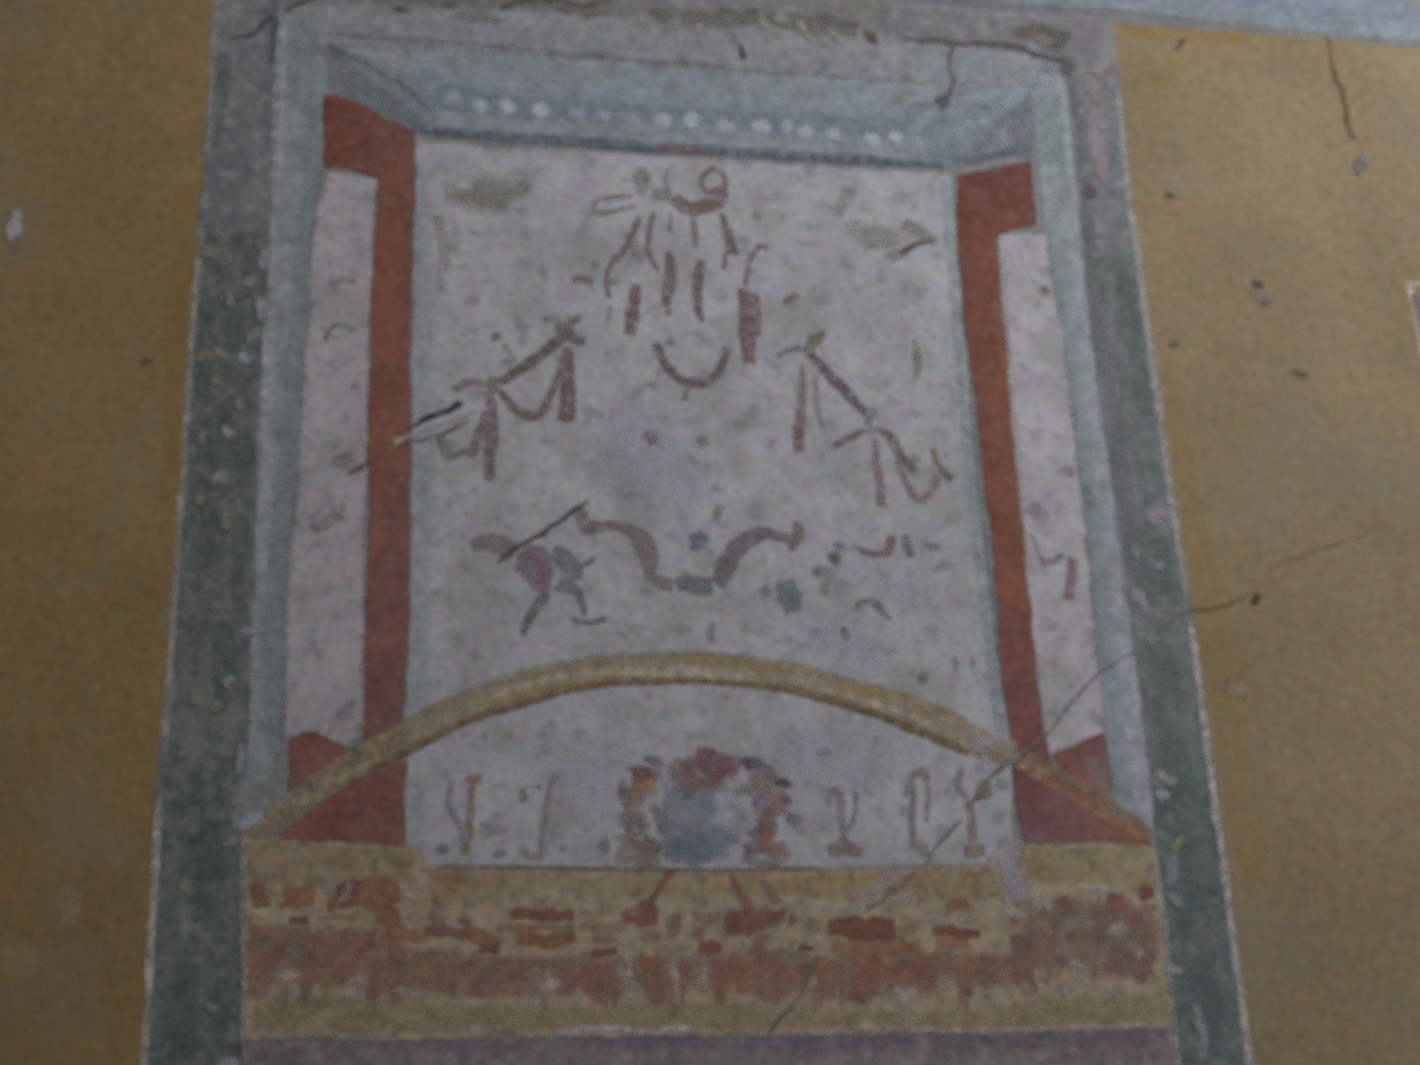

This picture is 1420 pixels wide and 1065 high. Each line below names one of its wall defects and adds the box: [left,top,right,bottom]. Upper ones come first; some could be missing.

crack [229,0,313,66]
crack [934,41,961,110]
crack [1325,35,1369,176]
crack [838,593,1249,918]
crack [763,954,820,1039]